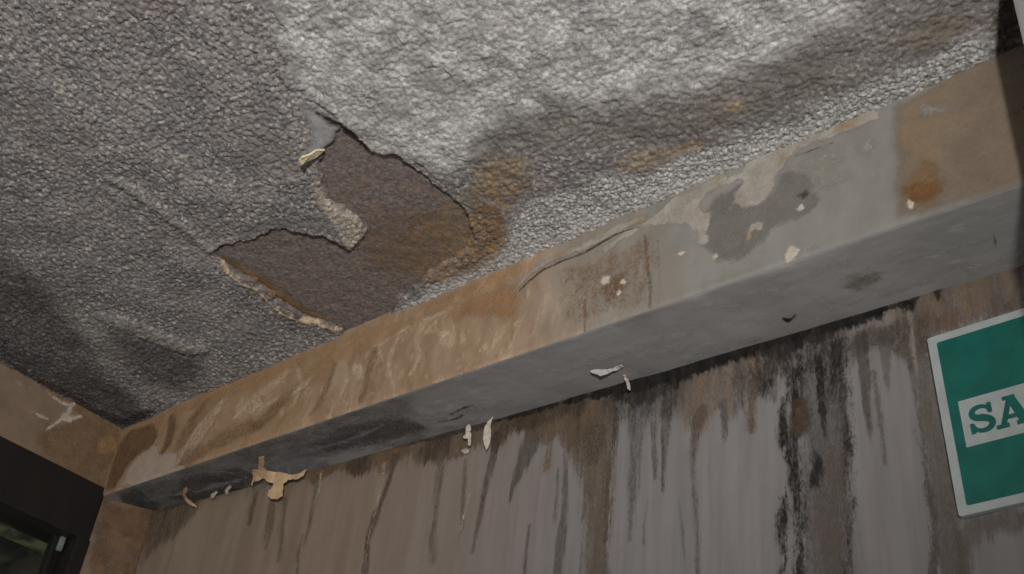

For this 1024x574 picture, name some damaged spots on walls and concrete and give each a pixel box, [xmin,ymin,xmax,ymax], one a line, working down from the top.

water stain [274,0,1024,317]
peeling [599,110,880,253]
flaking render [213,109,473,332]
crack [518,214,647,290]
peeling [785,246,815,263]
peeling [590,364,630,390]
peeling [461,417,493,454]
water stain [0,260,1024,574]
peeling [251,456,306,499]